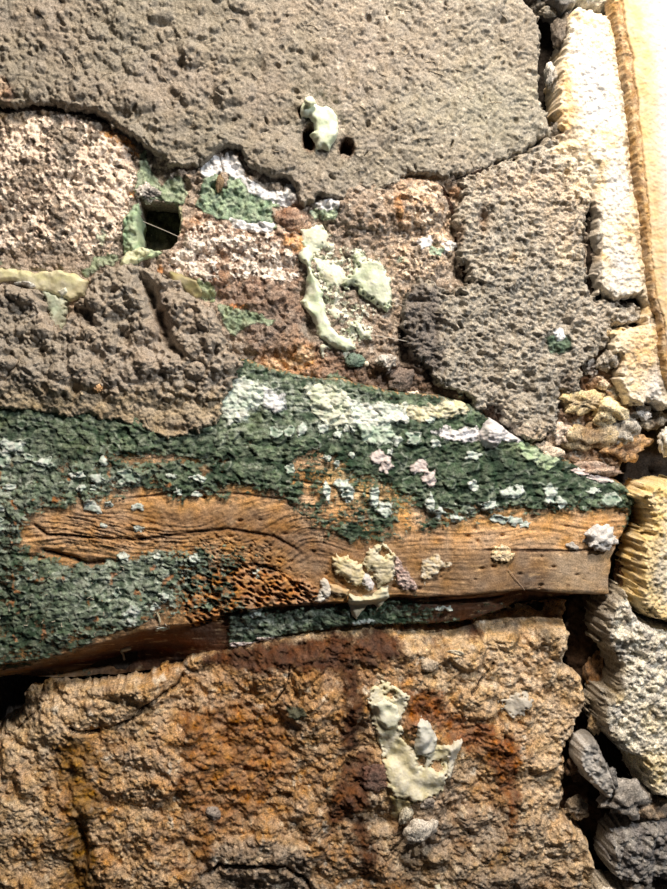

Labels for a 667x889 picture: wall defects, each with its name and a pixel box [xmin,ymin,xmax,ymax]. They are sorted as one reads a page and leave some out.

crack [537,18,555,111]
crack [0,77,110,126]
spalling [298,109,315,151]
spalling [340,139,354,155]
spalling [135,181,180,251]
rust [176,698,289,865]
rust [401,688,523,865]